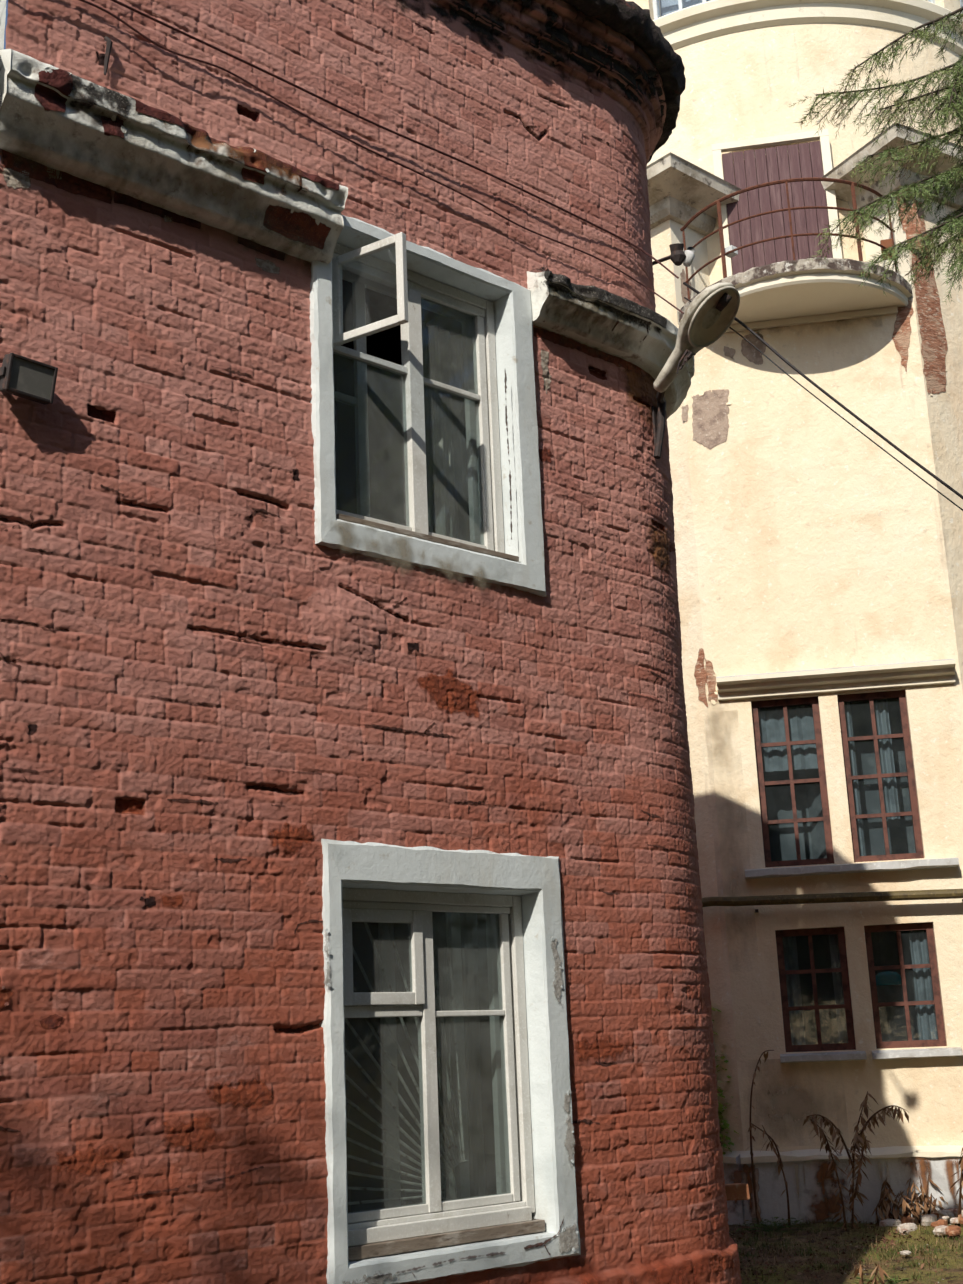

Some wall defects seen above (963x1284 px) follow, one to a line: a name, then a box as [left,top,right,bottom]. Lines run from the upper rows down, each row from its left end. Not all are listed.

spalling [34,67,73,112]
spalling [101,114,127,139]
flaking render [135,99,339,191]
flaking render [2,150,201,229]
flaking render [237,205,331,261]
flaking render [892,187,948,396]
spalling [651,519,676,552]
spalling [417,669,482,718]
flaking render [694,648,718,707]
peeling [559,1224,579,1253]
peeling [343,1274,395,1284]
damp [573,1257,710,1284]